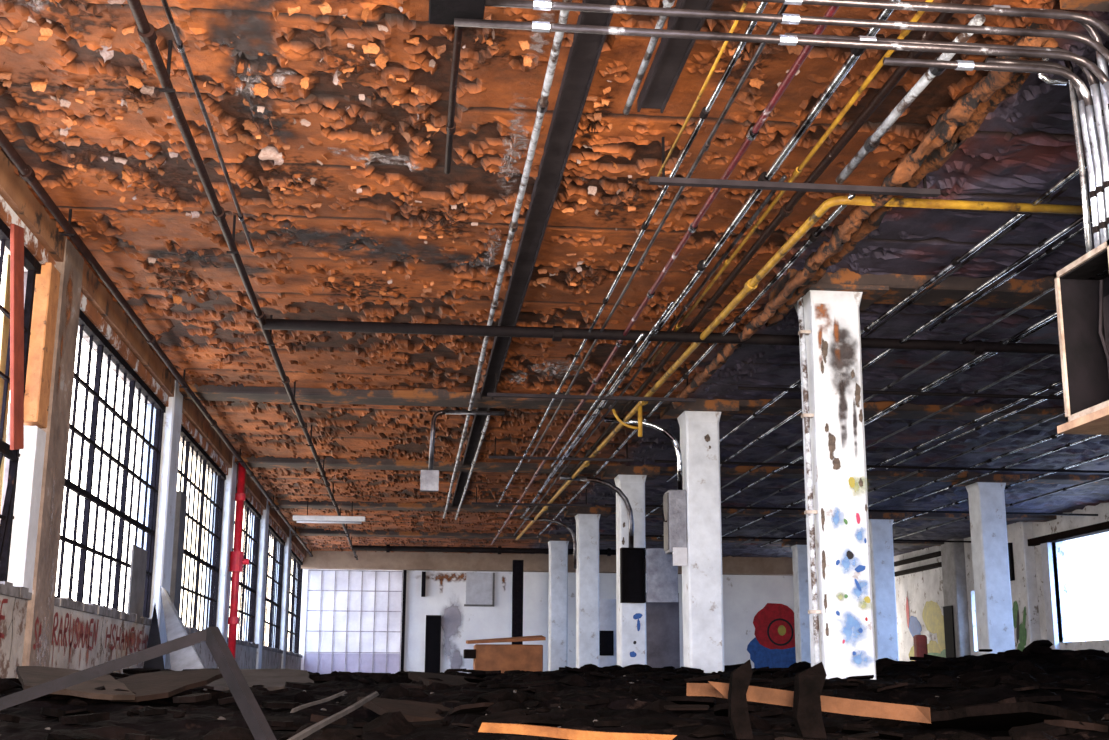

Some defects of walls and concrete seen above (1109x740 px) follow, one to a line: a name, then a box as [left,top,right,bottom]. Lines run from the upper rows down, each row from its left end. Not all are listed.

peeling [272,0,389,32]
peeling [429,7,532,69]
peeling [714,26,805,89]
peeling [0,0,205,218]
peeling [300,37,440,156]
peeling [581,68,618,149]
peeling [211,77,334,208]
peeling [399,195,495,251]
peeling [562,161,672,235]
peeling [320,266,410,309]
peeling [532,253,607,293]
spalling [825,423,841,470]